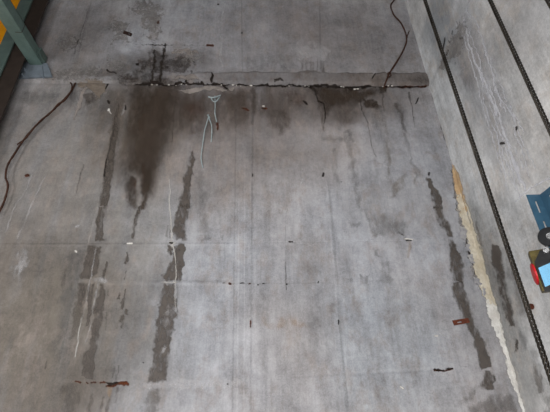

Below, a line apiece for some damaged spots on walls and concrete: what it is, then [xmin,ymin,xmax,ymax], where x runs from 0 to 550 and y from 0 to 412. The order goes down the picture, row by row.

damp [78,100,126,379]
damp [127,89,173,226]
damp [148,152,195,382]
crack [135,72,426,122]
damp [316,87,387,110]
damp [427,178,496,390]
spalling [452,182,486,295]
damp [452,164,525,412]